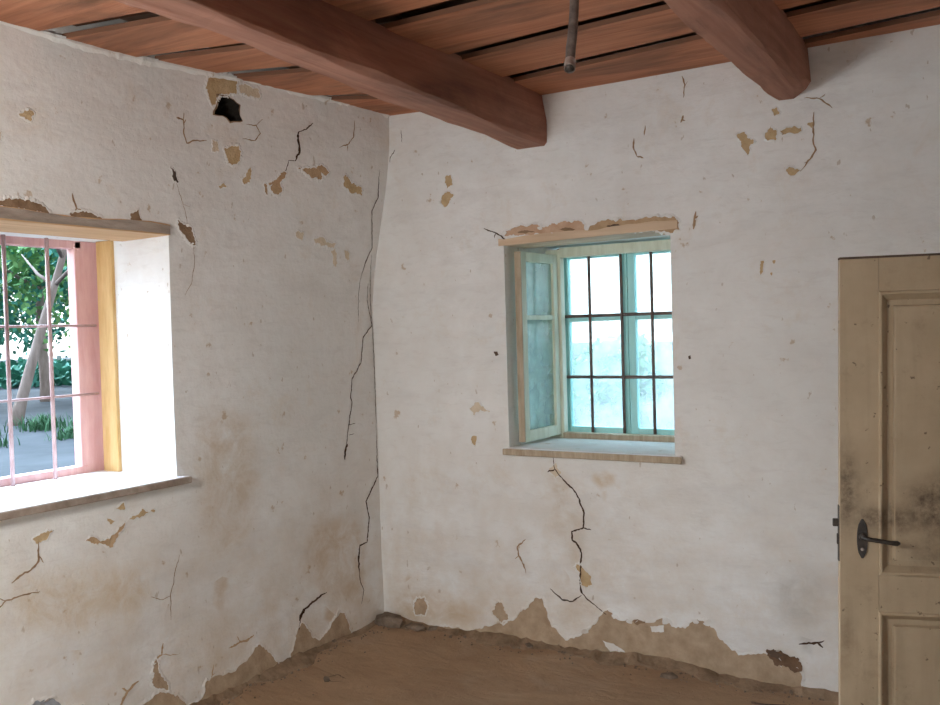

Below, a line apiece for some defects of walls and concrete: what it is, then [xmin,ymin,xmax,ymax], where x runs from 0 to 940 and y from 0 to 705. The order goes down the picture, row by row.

flaking render [204,72,262,123]
flaking render [211,138,364,199]
crack [285,123,313,171]
flaking render [502,213,681,239]
crack [344,249,378,604]
crack [0,543,44,608]
water stain [0,545,166,679]
water stain [186,389,273,619]
flaking render [138,610,353,705]
crack [299,592,327,629]
crack [548,458,605,614]
flaking render [440,594,806,687]